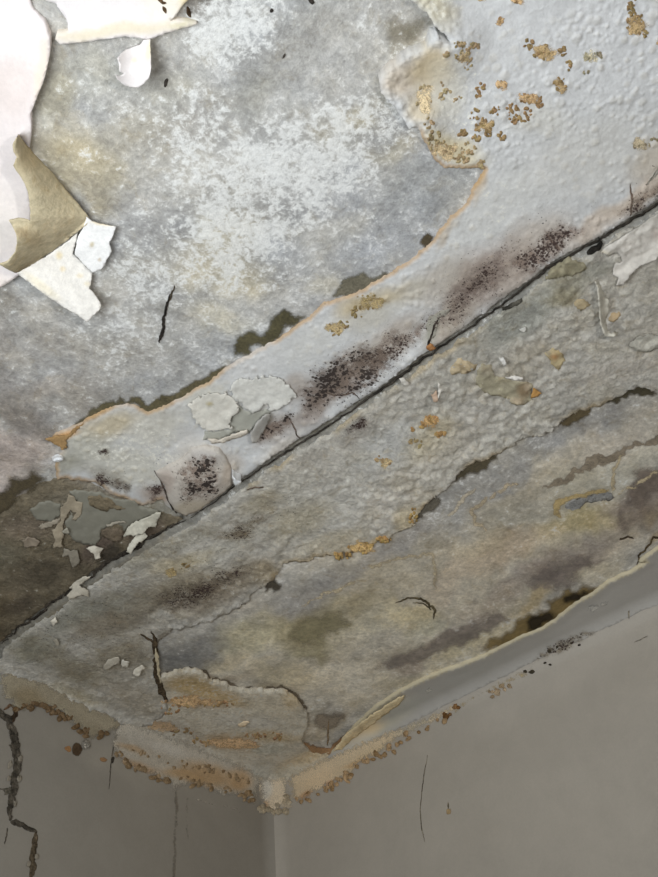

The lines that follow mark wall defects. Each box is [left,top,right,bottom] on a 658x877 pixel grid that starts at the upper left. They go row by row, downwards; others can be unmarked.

peeling [0,0,197,322]
corrosion [416,80,544,170]
corrosion [523,38,573,94]
corrosion [626,0,649,38]
peeling [45,0,658,511]
crack [87,168,658,578]
damp [301,219,579,417]
damp [0,472,183,642]
crack [140,632,168,702]
peeling [0,224,658,782]
damp [386,558,595,669]
crack [0,704,39,877]